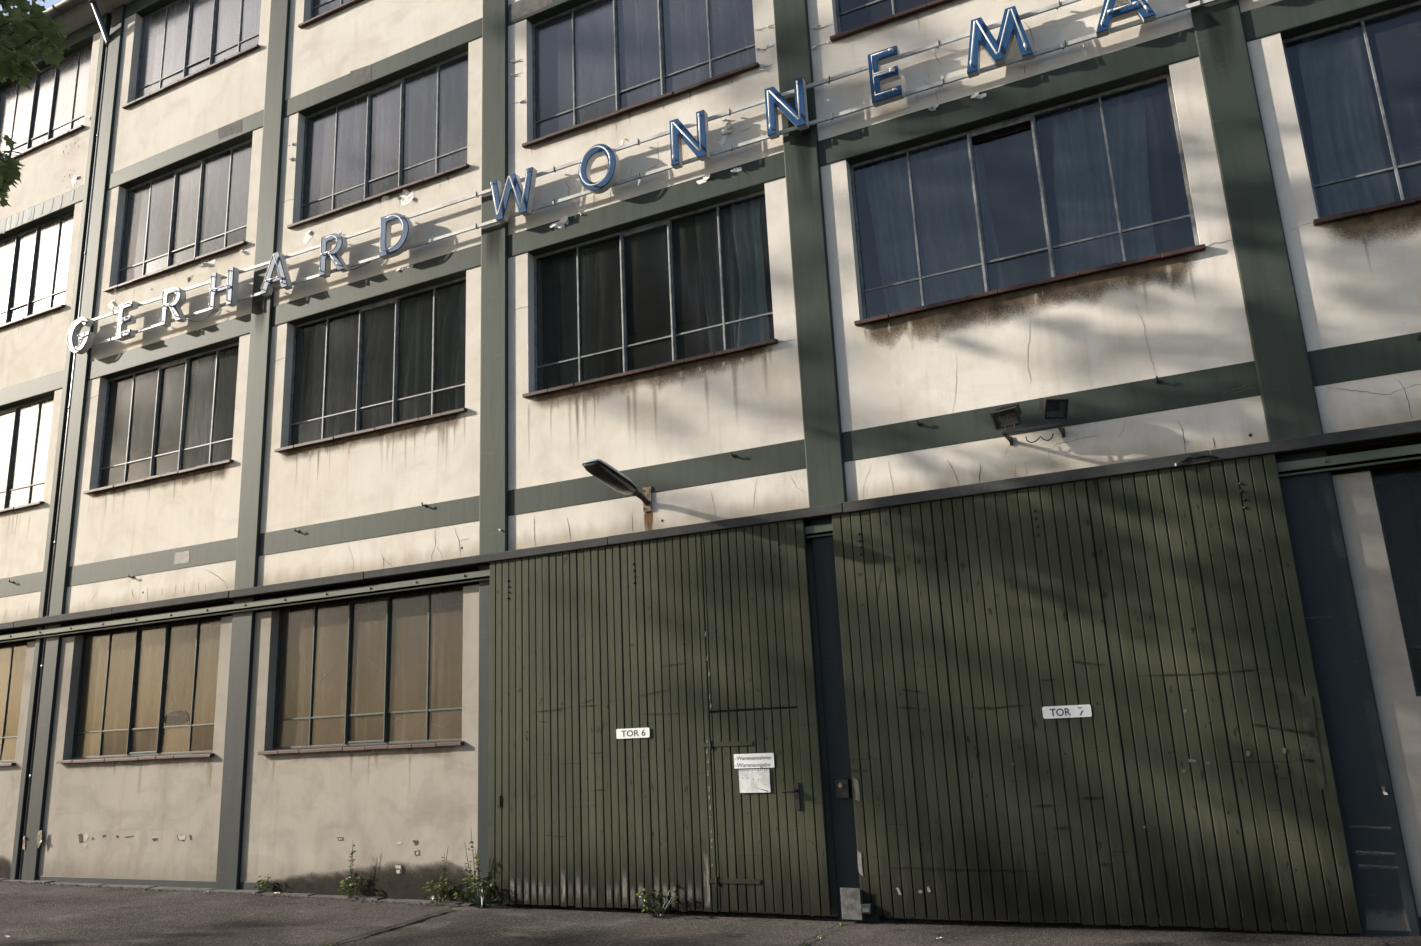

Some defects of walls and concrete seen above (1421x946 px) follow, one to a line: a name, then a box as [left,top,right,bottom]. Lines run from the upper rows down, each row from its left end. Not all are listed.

leakage [1330,203,1421,240]
leakage [868,253,1192,342]
leakage [535,346,767,405]
crack [1327,383,1421,417]
leakage [0,858,11,879]
leakage [260,863,472,902]